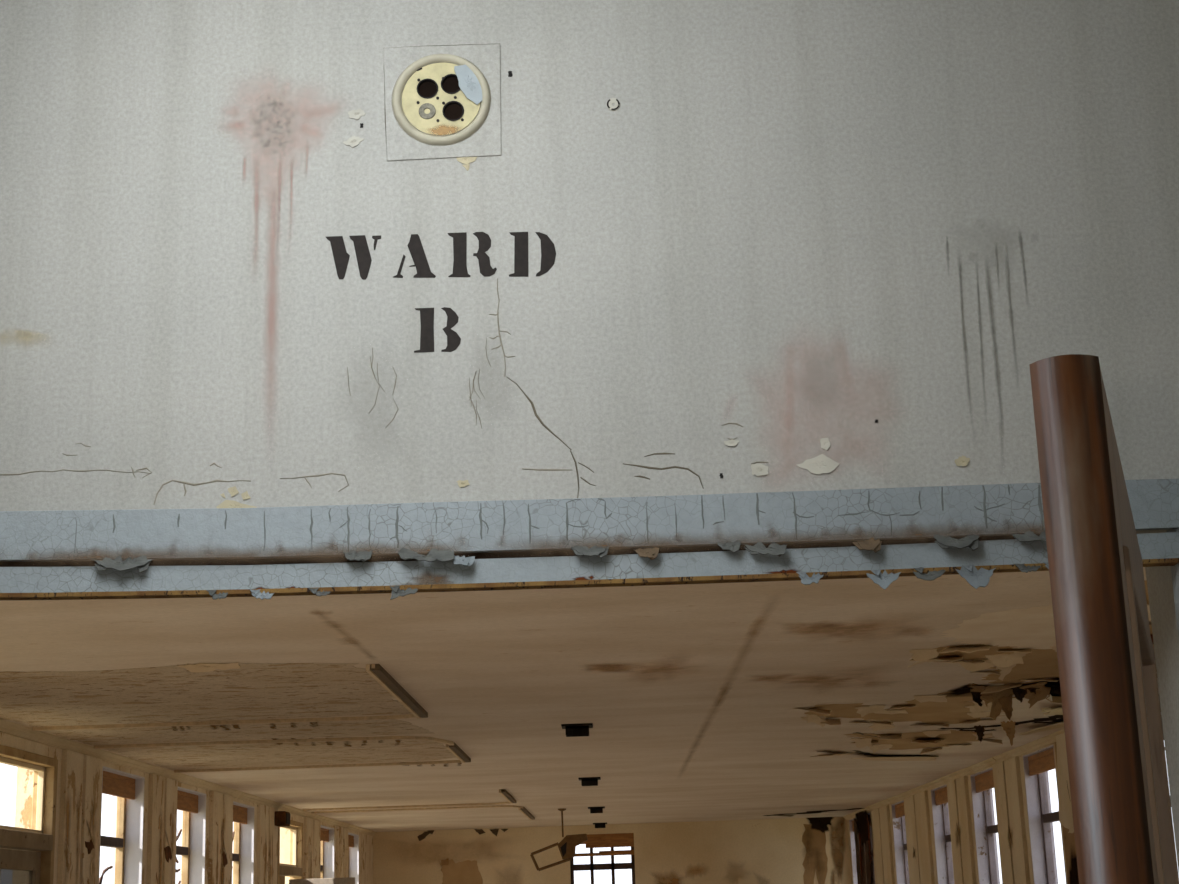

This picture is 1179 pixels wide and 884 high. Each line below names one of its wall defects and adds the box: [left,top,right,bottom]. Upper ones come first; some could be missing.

damp [977,250,1012,396]
crack [479,278,612,542]
crack [280,473,406,551]
crack [623,453,725,542]
crack [756,493,765,525]
crack [792,487,944,539]
crack [974,485,1010,528]
peeling [250,589,274,600]
peeling [866,565,996,590]
flaking render [793,605,1059,754]
flaking render [66,783,100,884]
spalling [440,858,483,884]